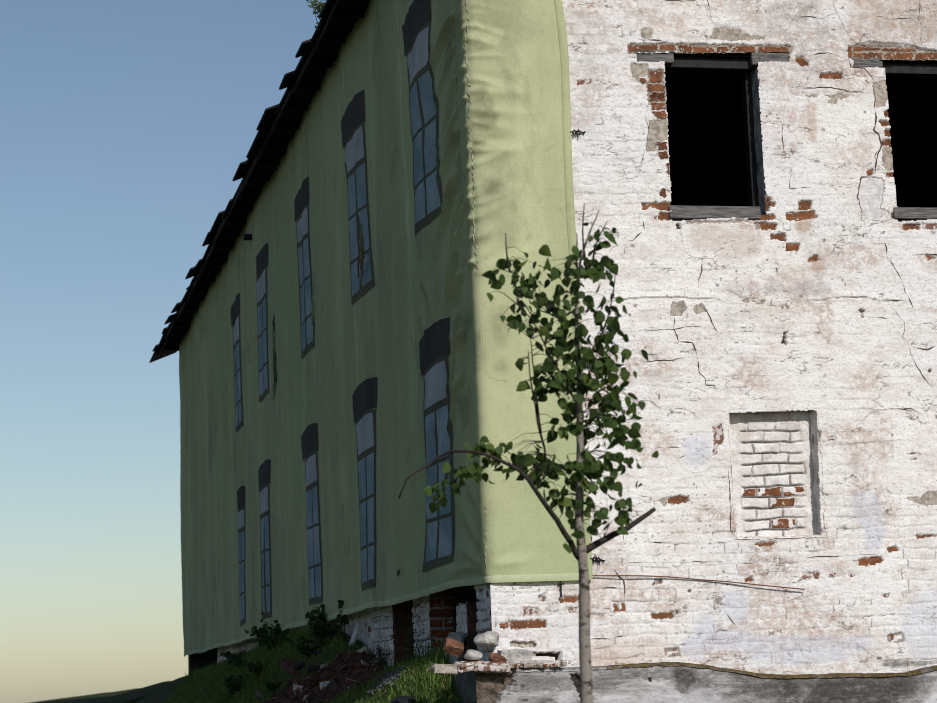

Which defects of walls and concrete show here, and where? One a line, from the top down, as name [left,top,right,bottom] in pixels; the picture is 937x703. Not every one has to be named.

flaking render [847,44,937,61]
flaking render [627,27,808,173]
crack [794,52,882,219]
spalling [872,80,893,178]
flaking render [642,188,671,221]
flaking render [749,196,817,251]
crack [641,308,718,386]
crack [842,243,937,388]
flaking render [490,620,546,629]
leakage [497,635,580,703]
crack [570,673,580,697]
leakage [590,581,937,703]